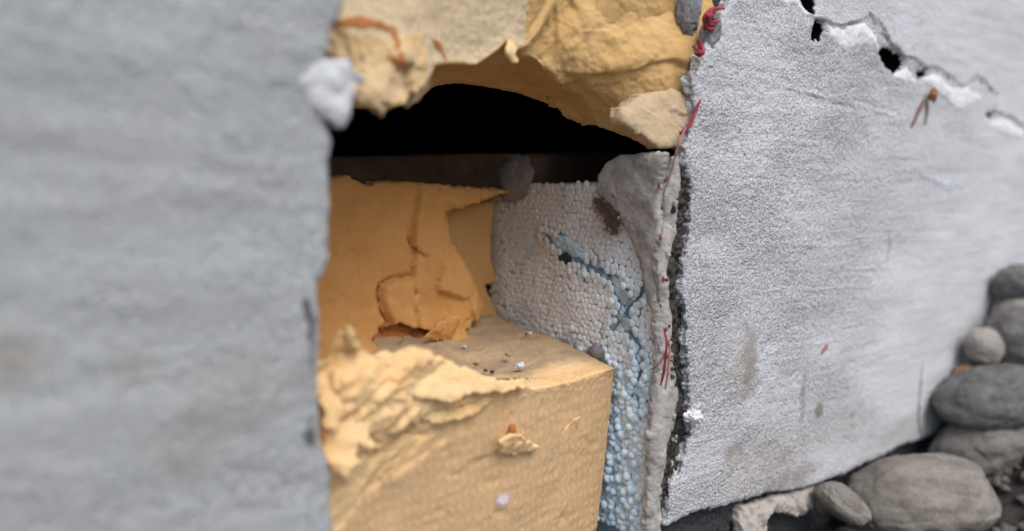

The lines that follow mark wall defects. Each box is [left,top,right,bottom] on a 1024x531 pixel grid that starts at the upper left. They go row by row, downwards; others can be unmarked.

crack [774,0,1024,141]
flaking render [299,59,355,129]
spalling [558,252,572,265]
flaking render [683,408,704,426]
peeling [498,424,539,456]